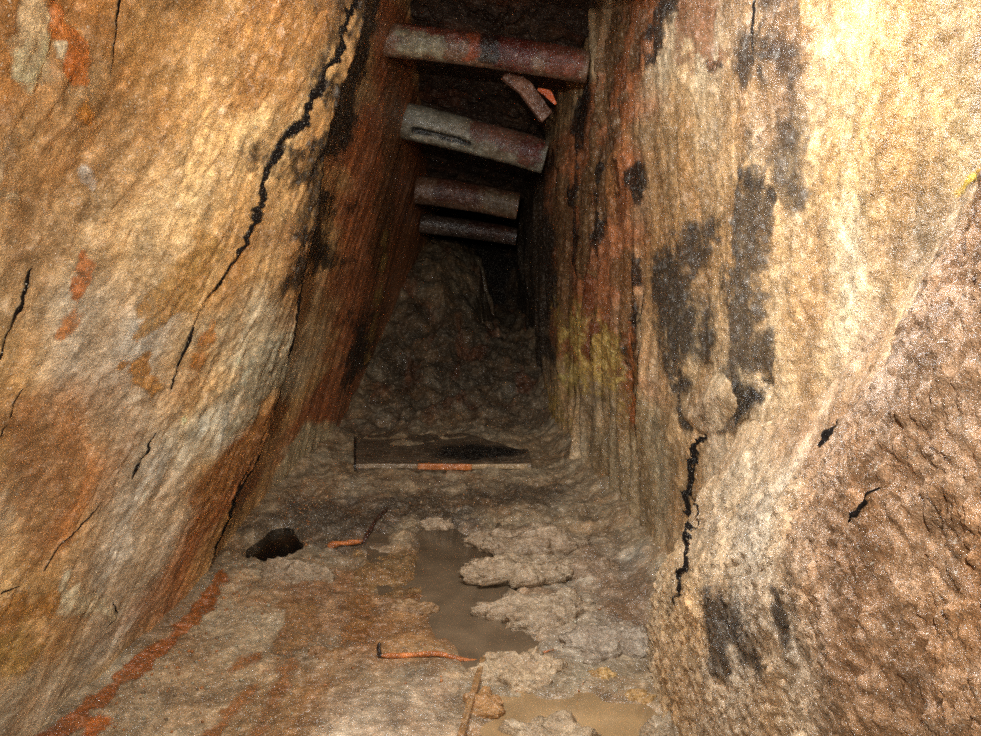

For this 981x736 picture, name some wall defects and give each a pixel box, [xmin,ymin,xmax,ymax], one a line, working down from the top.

crack [110,0,121,75]
water stain [639,0,679,65]
crack [171,0,358,389]
corrosion [363,57,406,364]
water stain [651,27,810,431]
crack [212,213,317,564]
crack [671,433,707,606]
corrosion [0,584,62,677]
corrosion [34,569,230,736]
water stain [703,587,759,678]
water stain [769,587,790,646]